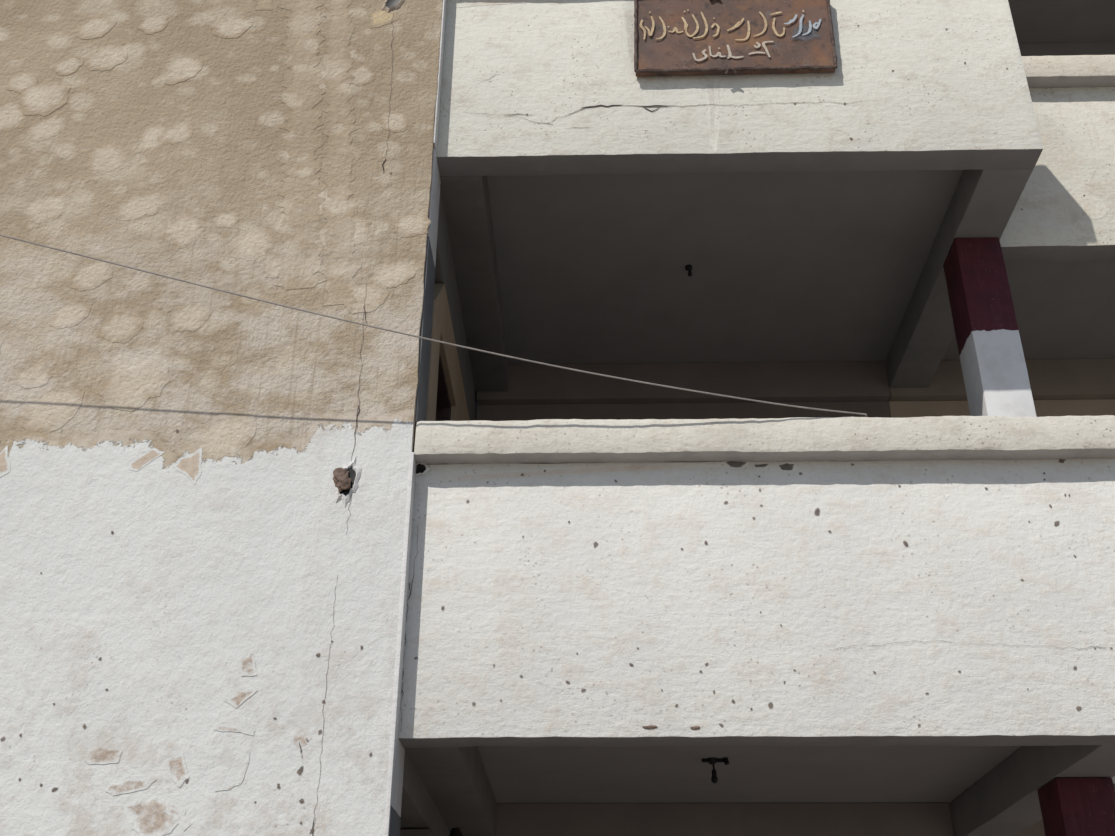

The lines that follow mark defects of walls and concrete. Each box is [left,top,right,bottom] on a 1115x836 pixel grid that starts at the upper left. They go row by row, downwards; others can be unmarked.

crack [440,74,873,129]
crack [351,284,367,461]
peeling [0,446,10,477]
peeling [127,448,165,471]
peeling [172,448,202,485]
spalling [340,466,356,496]